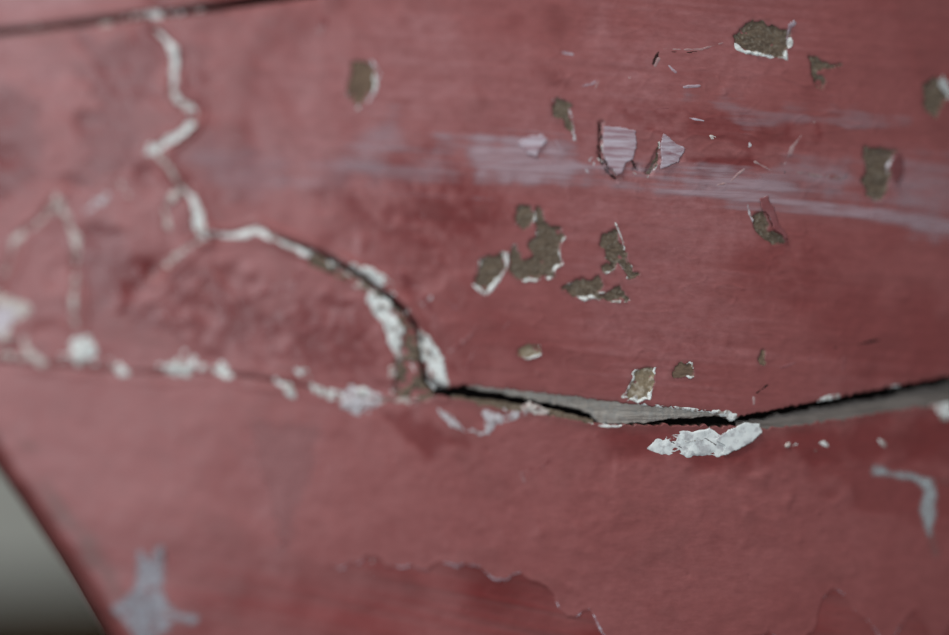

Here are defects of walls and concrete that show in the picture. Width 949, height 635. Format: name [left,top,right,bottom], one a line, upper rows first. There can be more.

peeling [733,20,796,60]
peeling [347,60,380,110]
peeling [552,97,576,141]
peeling [517,134,561,156]
peeling [585,123,685,179]
peeling [861,146,904,201]
crack [0,0,949,429]
peeling [747,196,788,245]
peeling [473,205,566,295]
peeling [561,223,640,303]
peeling [621,367,656,403]
peeling [647,422,762,458]